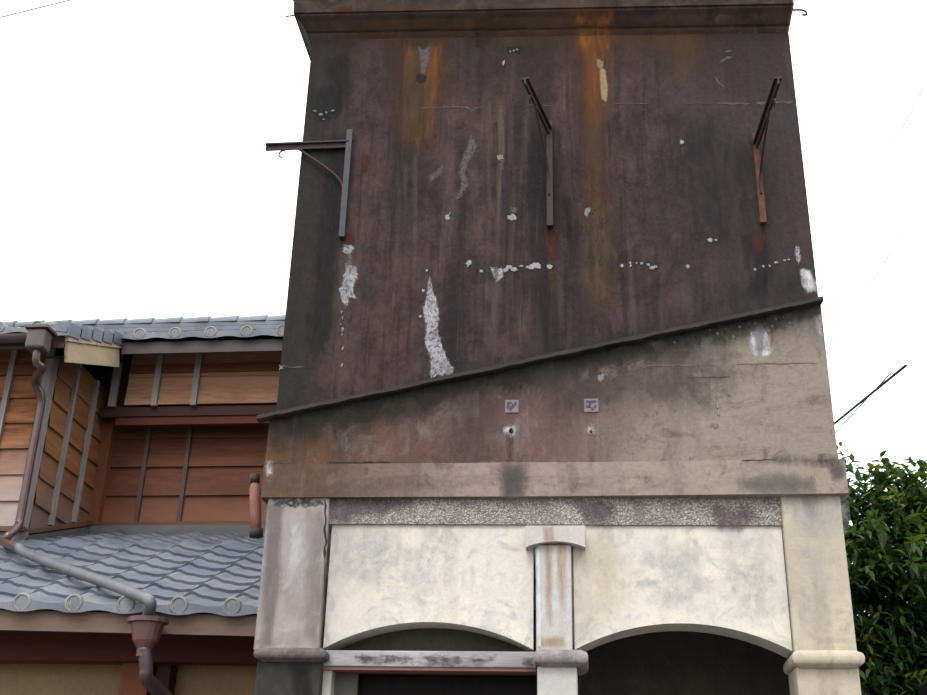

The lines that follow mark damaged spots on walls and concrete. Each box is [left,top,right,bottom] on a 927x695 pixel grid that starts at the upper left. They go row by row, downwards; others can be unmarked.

rust [576,12,612,48]
peeling [597,59,608,101]
peeling [465,260,553,282]
peeling [754,246,817,291]
peeling [339,244,358,351]
peeling [419,269,454,378]
leakage [504,466,522,496]
crack [321,499,329,622]